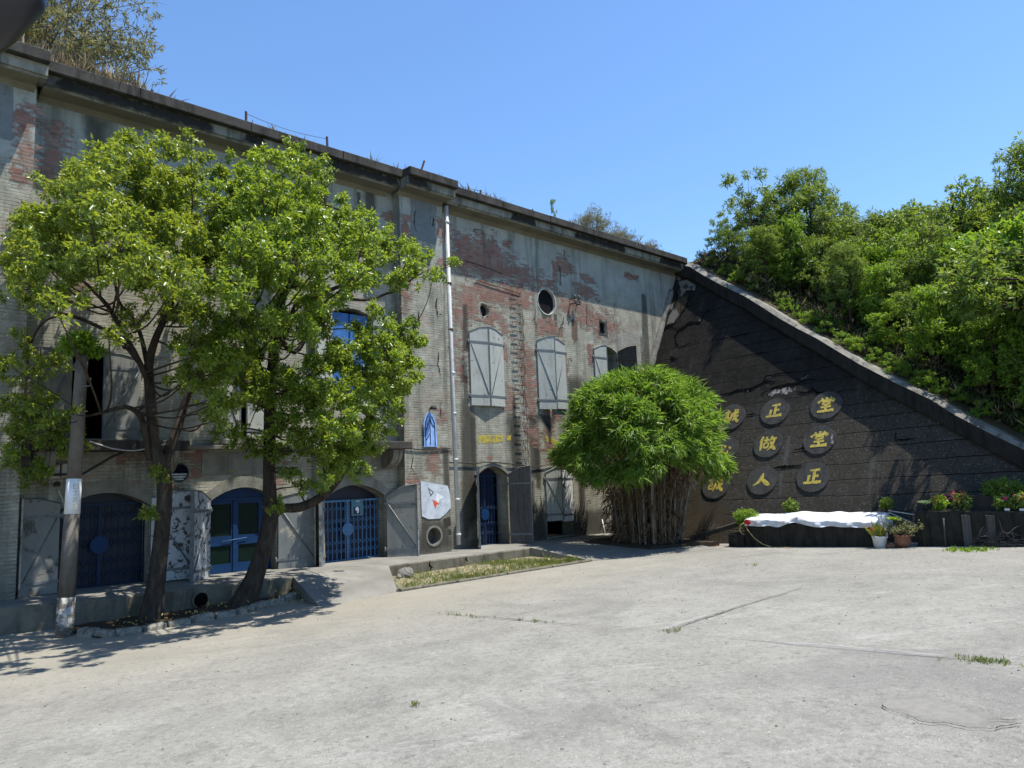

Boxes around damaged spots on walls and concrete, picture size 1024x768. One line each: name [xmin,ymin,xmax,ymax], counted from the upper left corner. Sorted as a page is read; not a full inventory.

peeling [9,101,73,194]
peeling [435,217,622,463]
crack [663,290,823,415]
crack [882,704,1018,729]